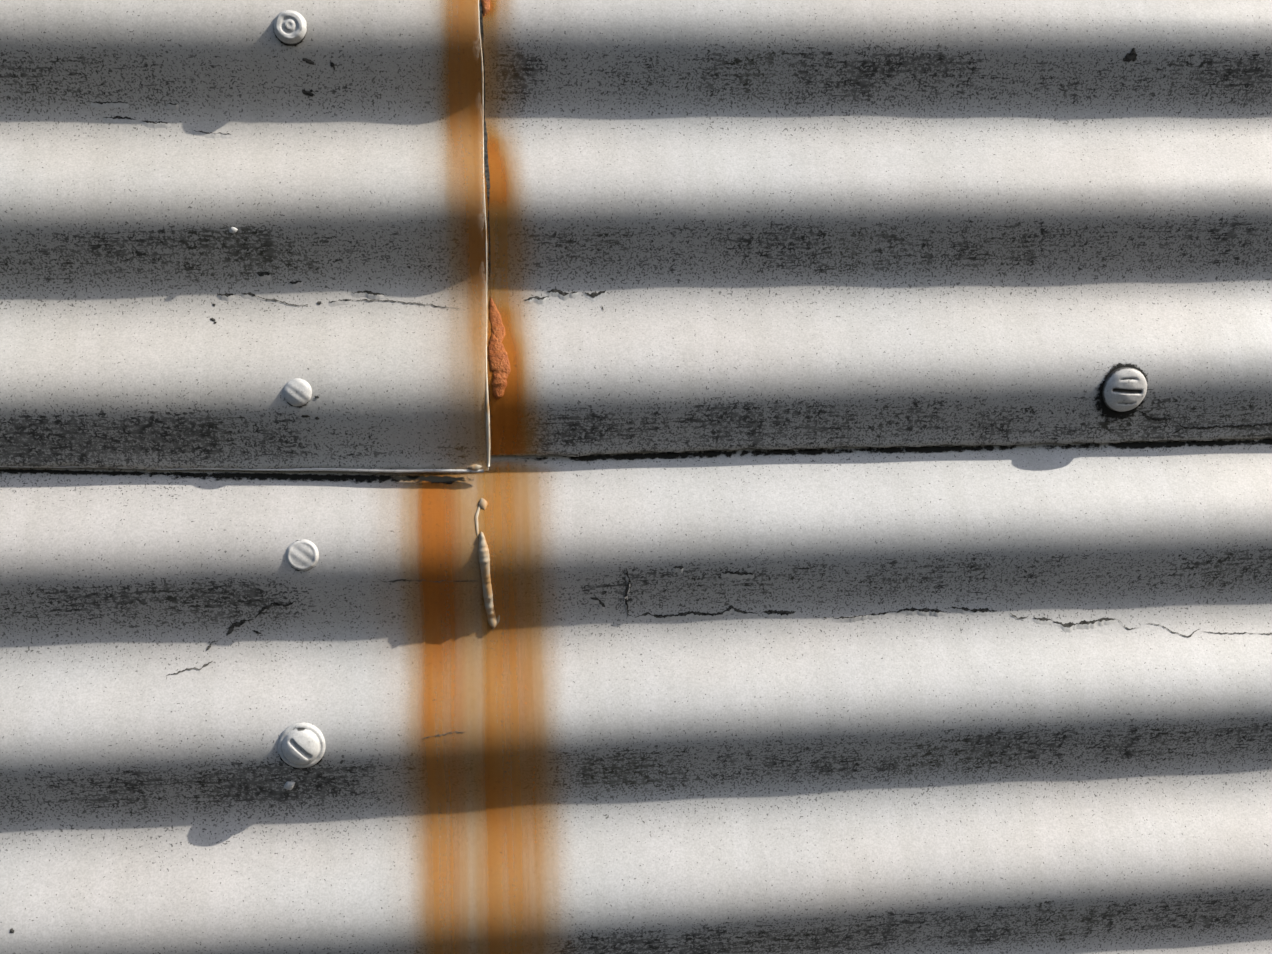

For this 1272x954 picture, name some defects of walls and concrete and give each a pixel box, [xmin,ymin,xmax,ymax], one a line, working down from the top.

crack [479,0,491,302]
crack [217,271,459,309]
crack [524,289,606,309]
rust [418,0,543,954]
crack [168,599,297,675]
crack [673,566,684,574]
crack [590,569,1272,637]